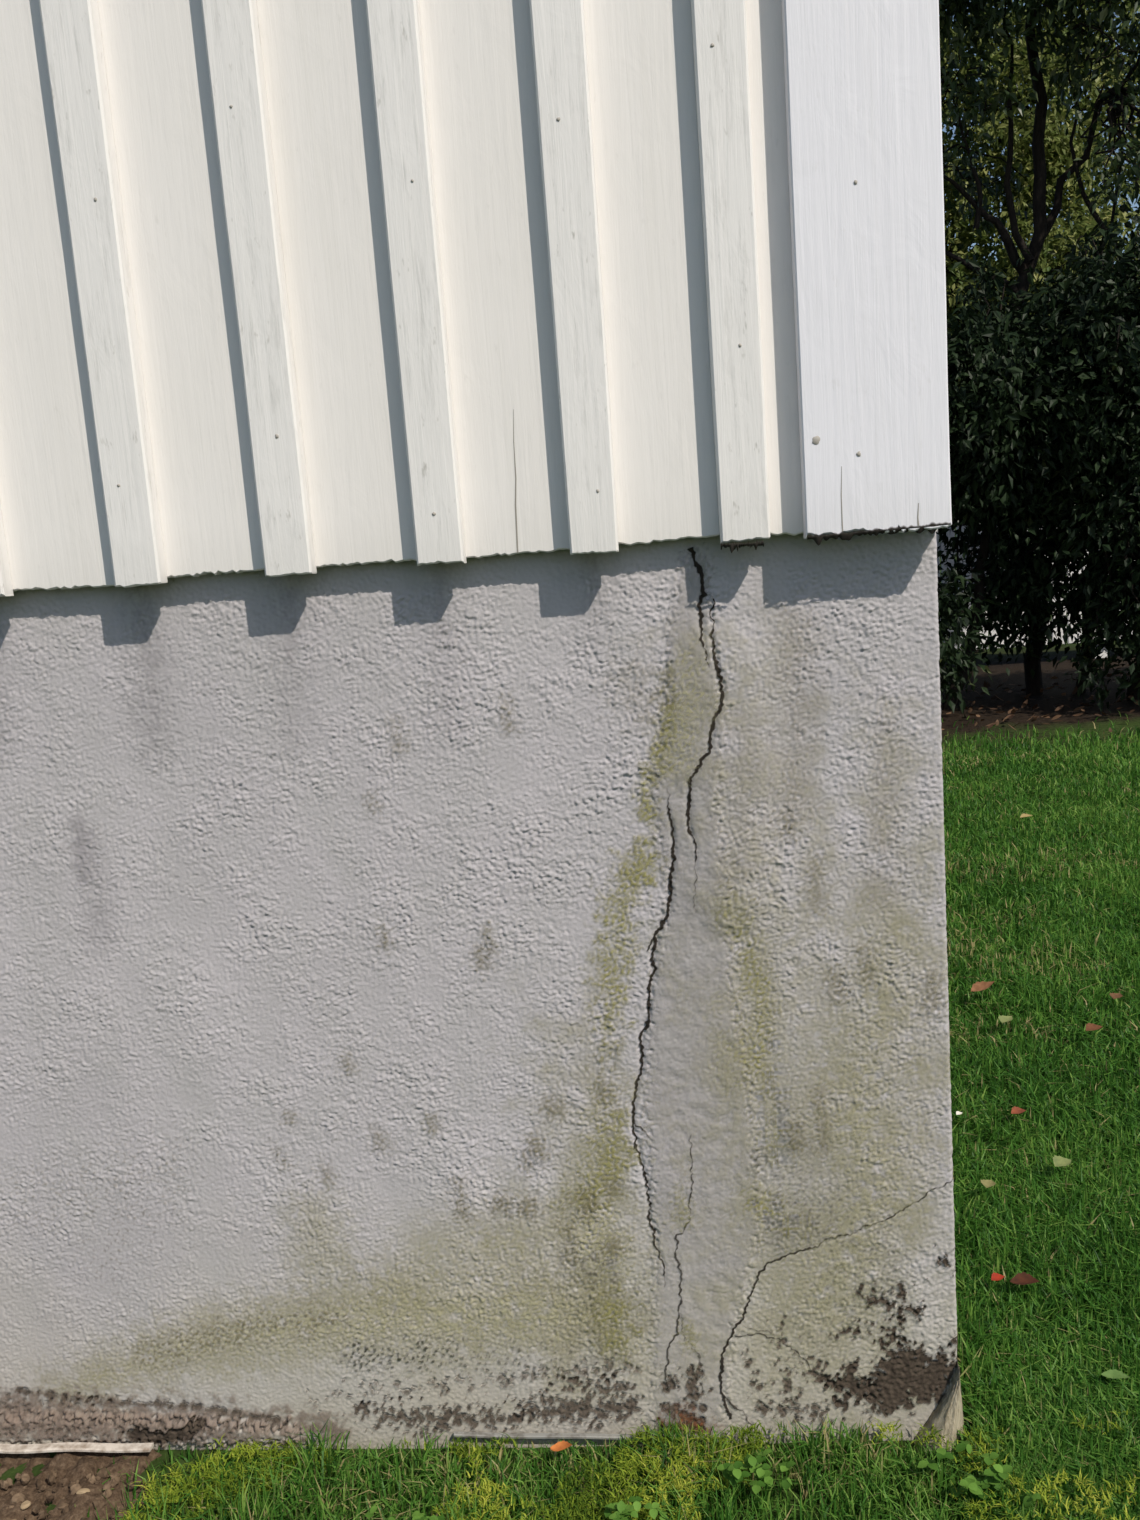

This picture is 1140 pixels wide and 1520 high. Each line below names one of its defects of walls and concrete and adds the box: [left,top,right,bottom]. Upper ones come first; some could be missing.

crack [632,547,724,1390]
damp [137,1311,337,1364]
damp [341,1338,560,1374]
crack [719,1176,954,1429]